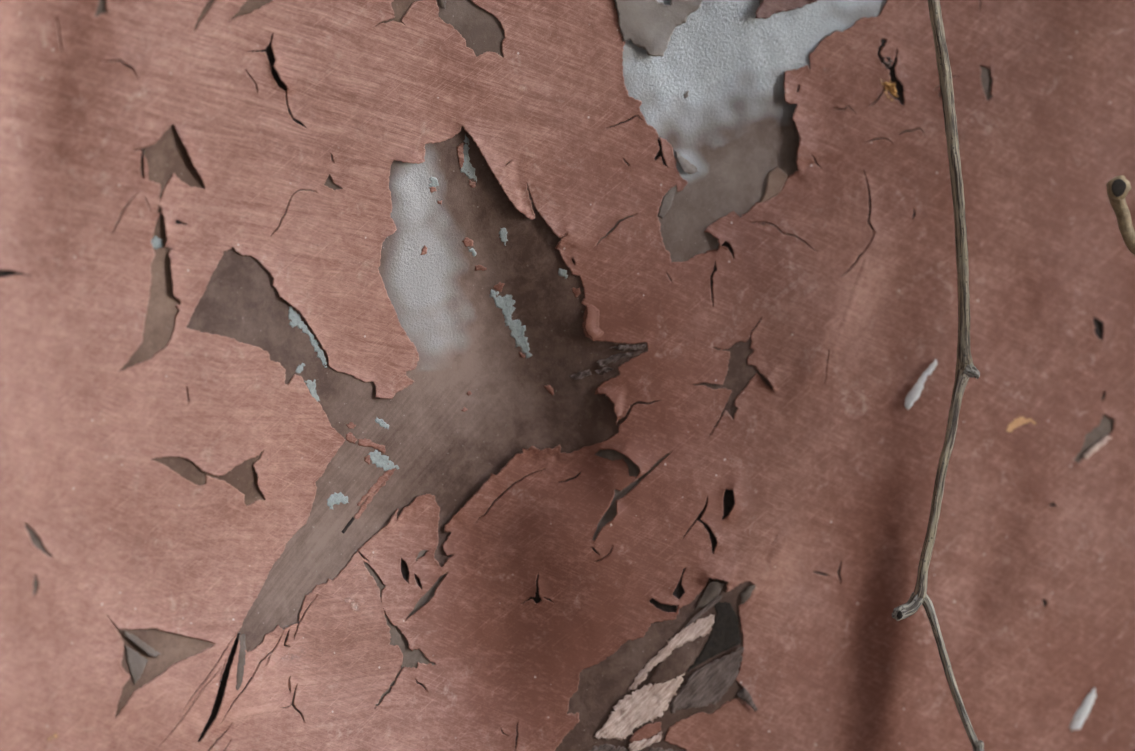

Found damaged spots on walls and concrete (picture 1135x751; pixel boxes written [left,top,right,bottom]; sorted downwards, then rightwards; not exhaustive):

crack [246,35,306,128]
peeling [436,0,505,58]
peeling [877,39,904,105]
peeling [614,0,886,262]
crack [0,269,30,277]
peeling [119,124,657,690]
peeling [693,337,773,435]
peeling [1074,414,1115,463]
peeling [107,616,215,717]
crack [169,596,317,751]
peeling [374,611,436,709]
peeling [555,578,758,751]